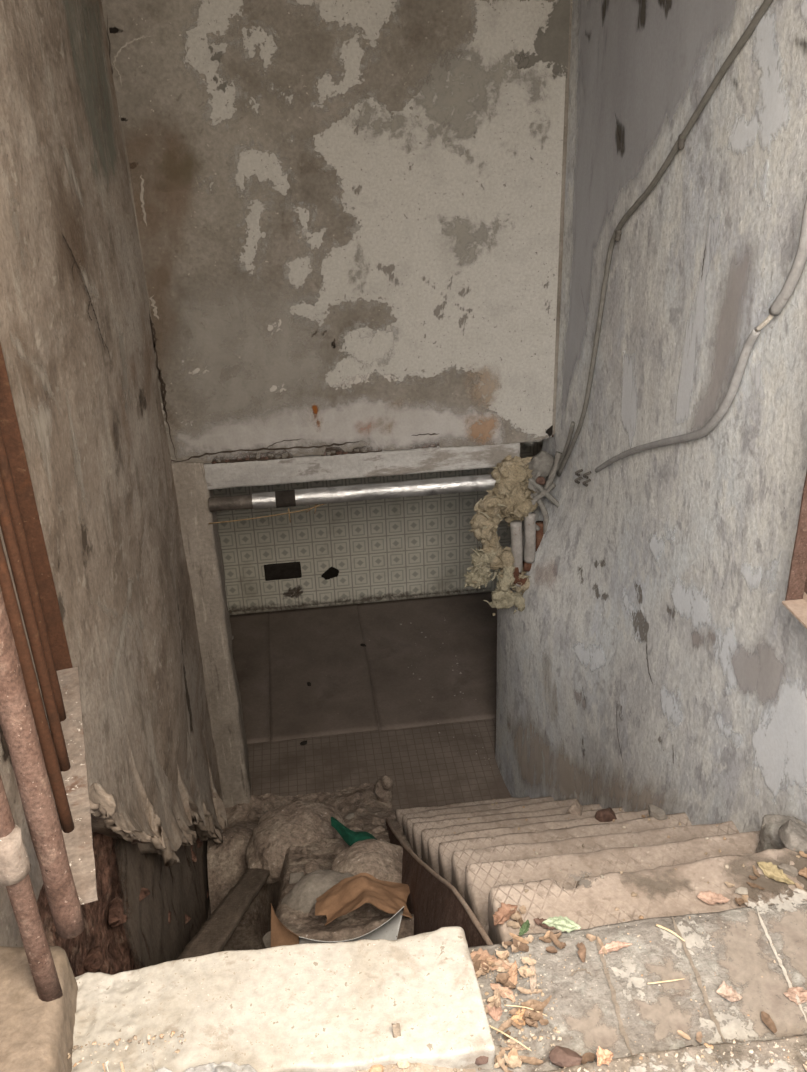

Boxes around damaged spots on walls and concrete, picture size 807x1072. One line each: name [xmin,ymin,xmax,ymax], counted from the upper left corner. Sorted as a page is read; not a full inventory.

peeling [183,0,293,126]
peeling [728,11,790,154]
peeling [232,0,736,438]
crack [62,234,111,363]
spalling [211,451,294,464]
crack [148,305,359,462]
spalling [321,446,382,456]
spalling [407,440,437,450]